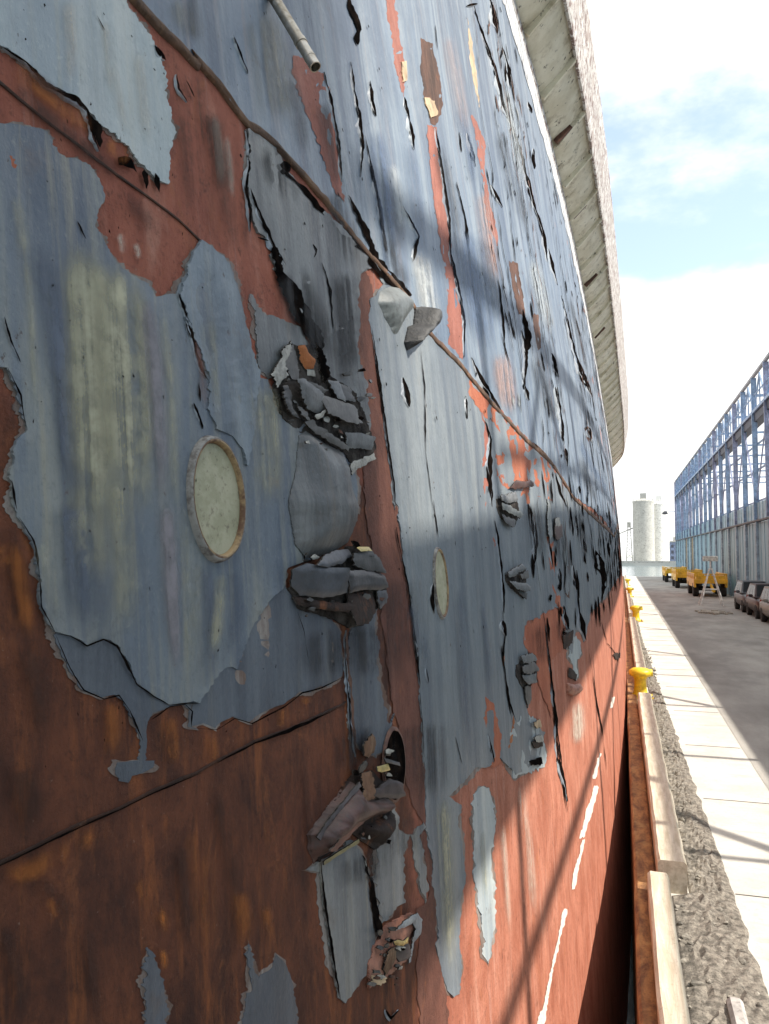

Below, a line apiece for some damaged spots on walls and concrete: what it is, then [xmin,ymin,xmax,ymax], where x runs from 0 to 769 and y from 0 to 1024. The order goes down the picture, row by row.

peeling [0,0,180,185]
crack [323,0,420,296]
crack [5,319,27,427]
crack [0,482,357,866]
peeling [0,97,619,1024]
crack [403,0,623,811]